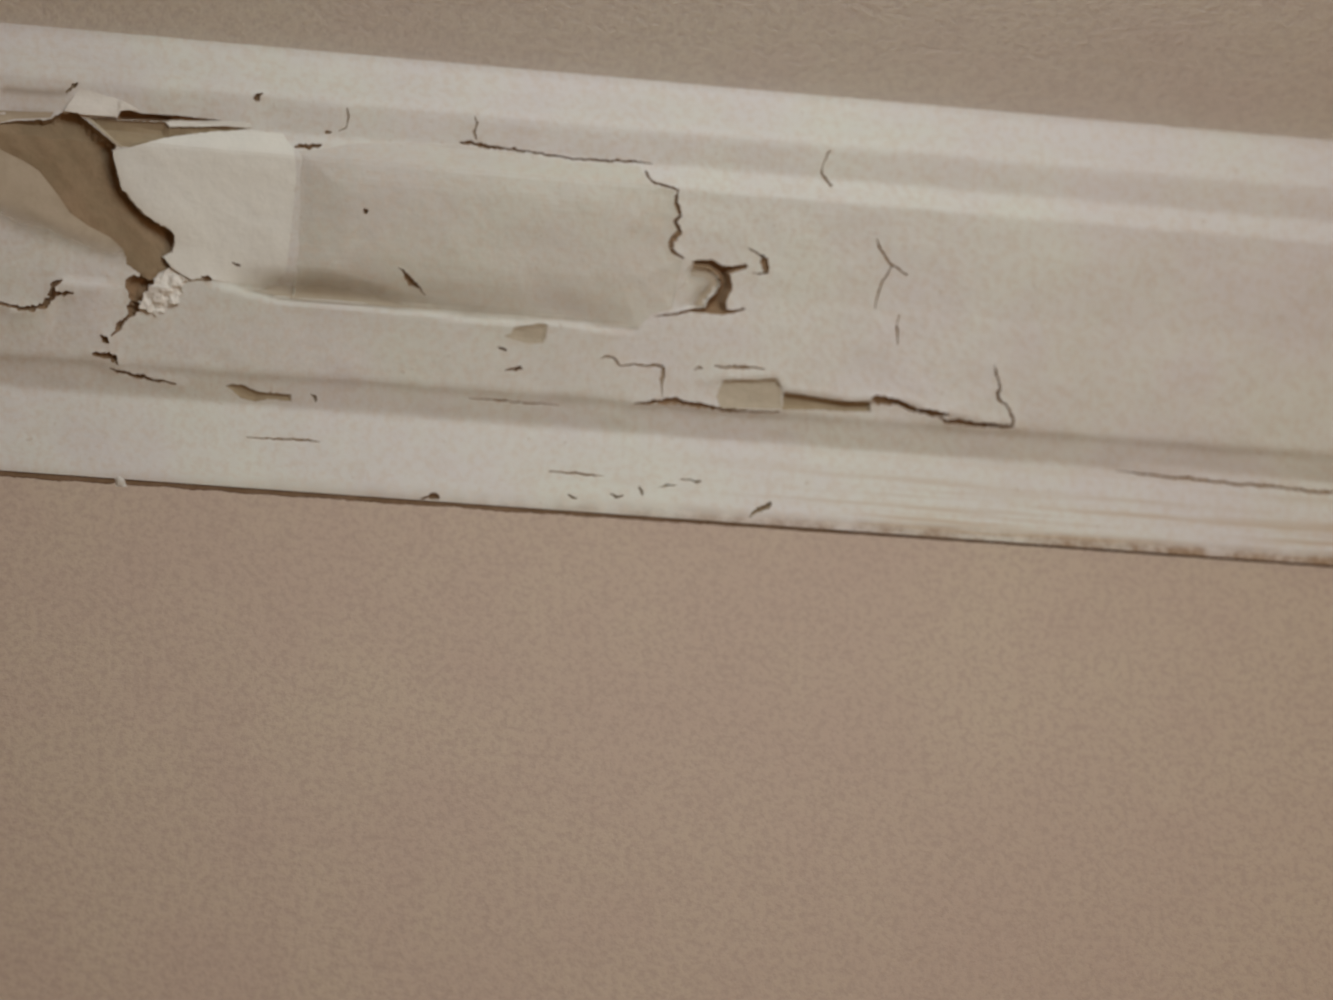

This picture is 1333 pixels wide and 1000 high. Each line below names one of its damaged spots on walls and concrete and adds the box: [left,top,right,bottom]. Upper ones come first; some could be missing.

peeling [0,89,297,316]
crack [460,117,685,259]
crack [0,280,74,312]
crack [748,248,769,275]
crack [875,239,908,345]
crack [92,273,176,385]
peeling [225,384,292,402]
crack [601,355,779,413]
peeling [716,379,871,412]
crack [872,365,1015,429]